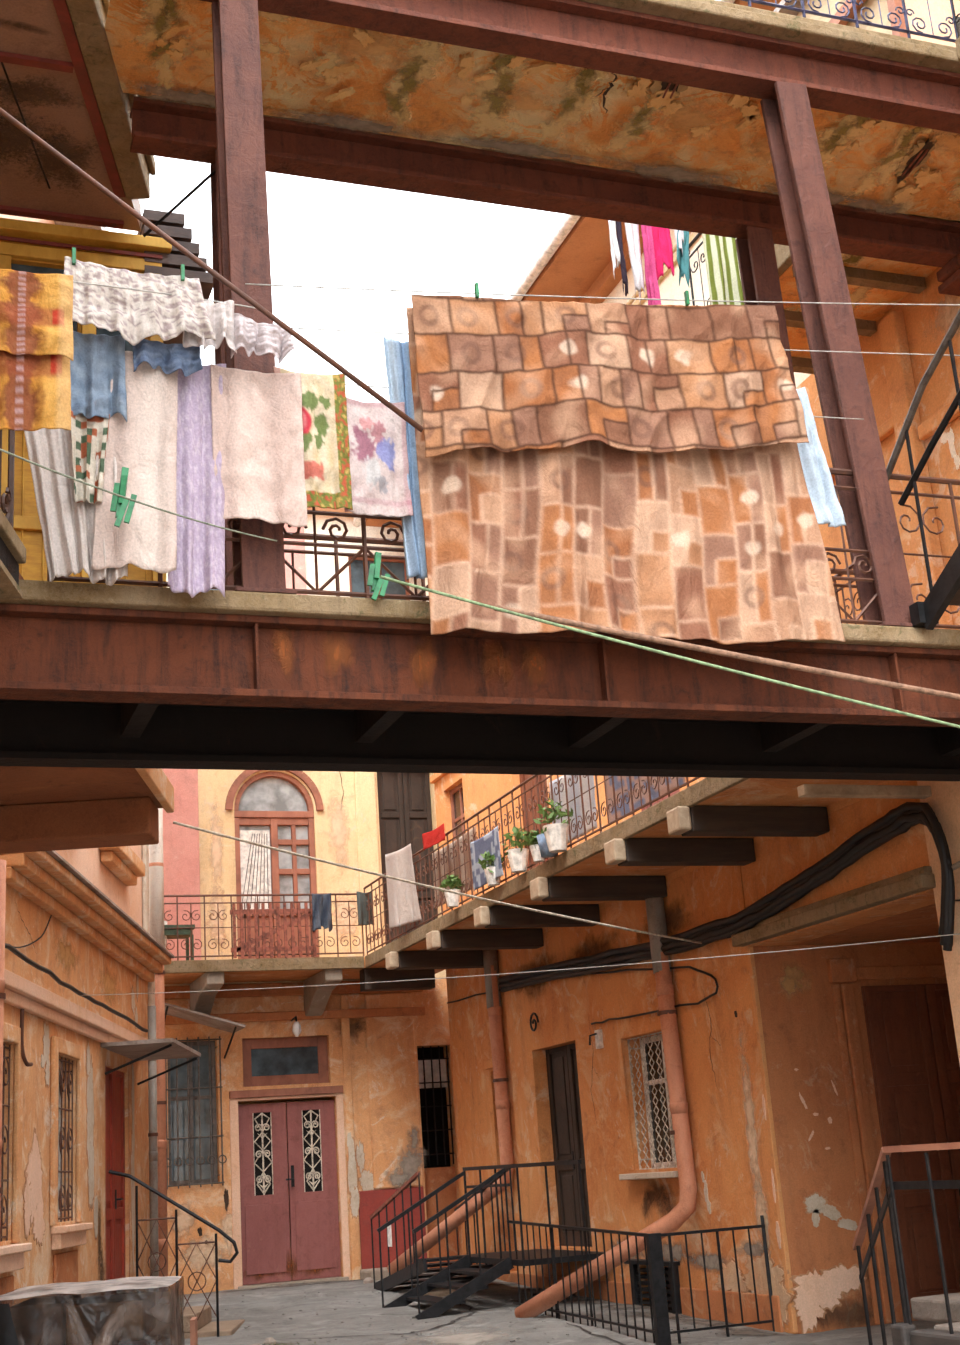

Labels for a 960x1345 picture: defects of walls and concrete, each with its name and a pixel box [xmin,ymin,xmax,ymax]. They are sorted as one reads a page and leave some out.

water stain [0,78,92,188]
rust [275,633,293,670]
peeling [803,1192,858,1230]
flaking render [715,1221,868,1334]